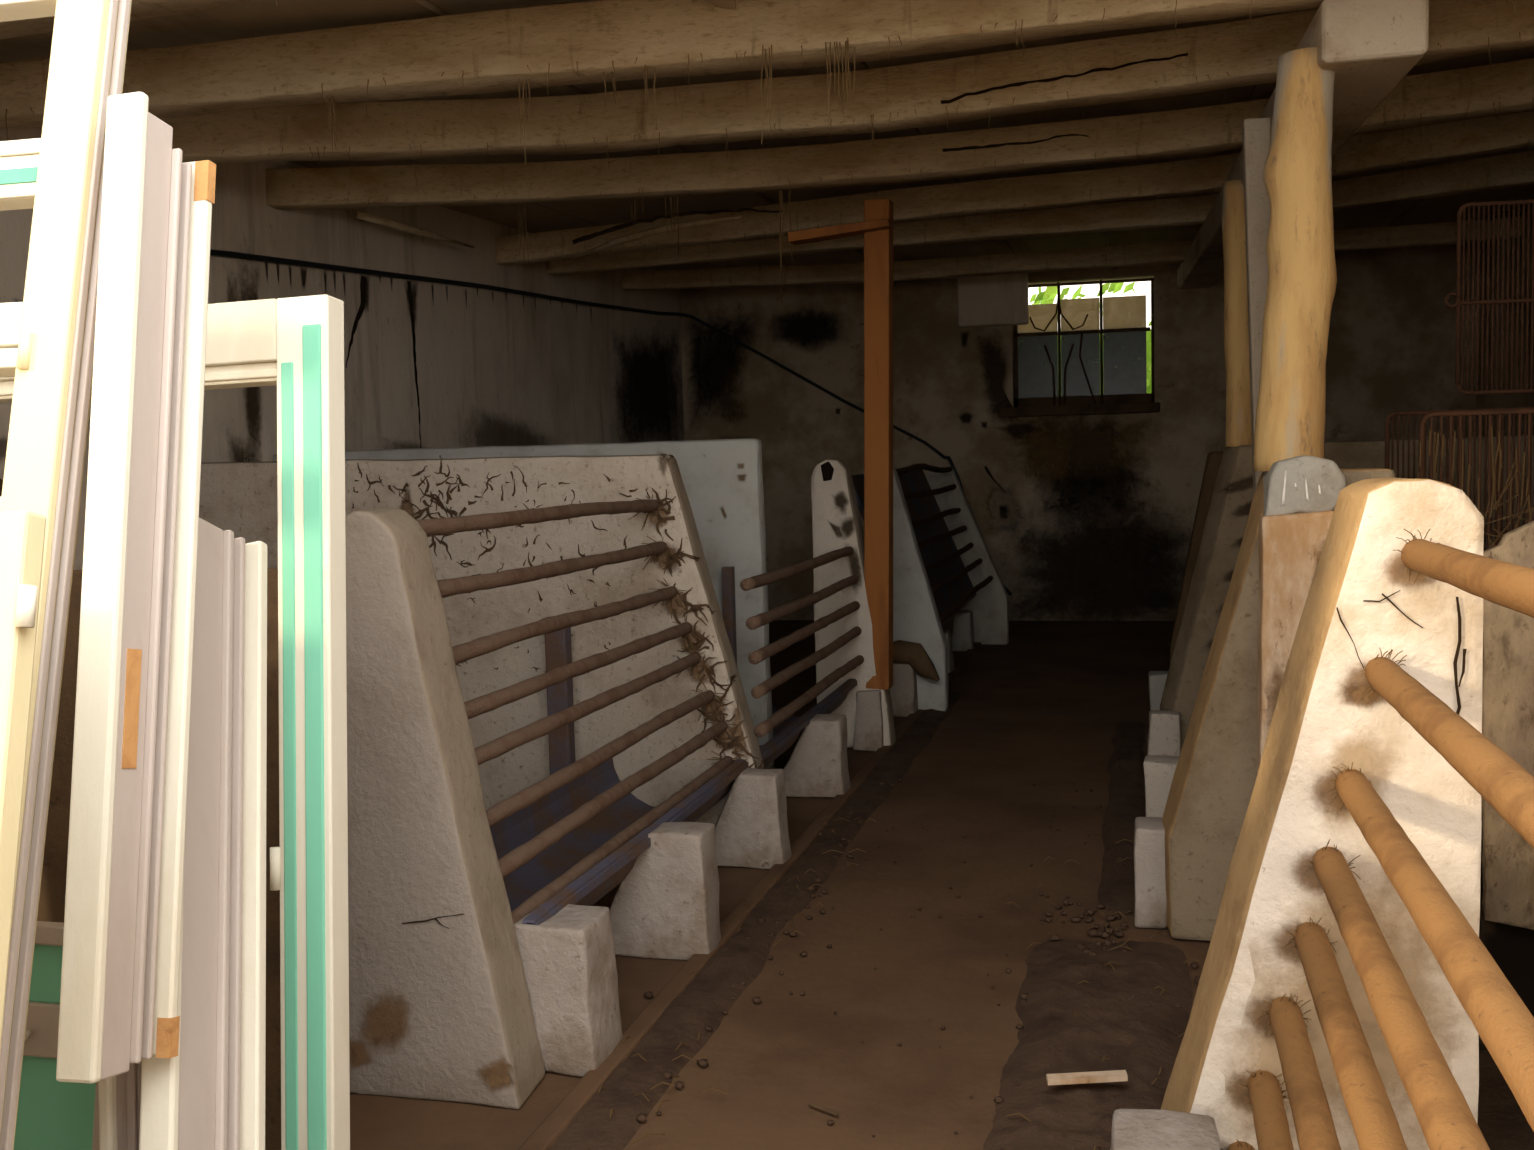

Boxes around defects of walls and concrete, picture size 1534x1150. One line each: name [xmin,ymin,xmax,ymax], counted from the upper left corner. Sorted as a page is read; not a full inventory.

crack [941,53,1188,104]
crack [943,134,1089,152]
crack [346,275,369,368]
crack [406,281,421,447]
leakage [616,315,753,443]
leakage [774,309,841,349]
crack [1336,590,1467,715]